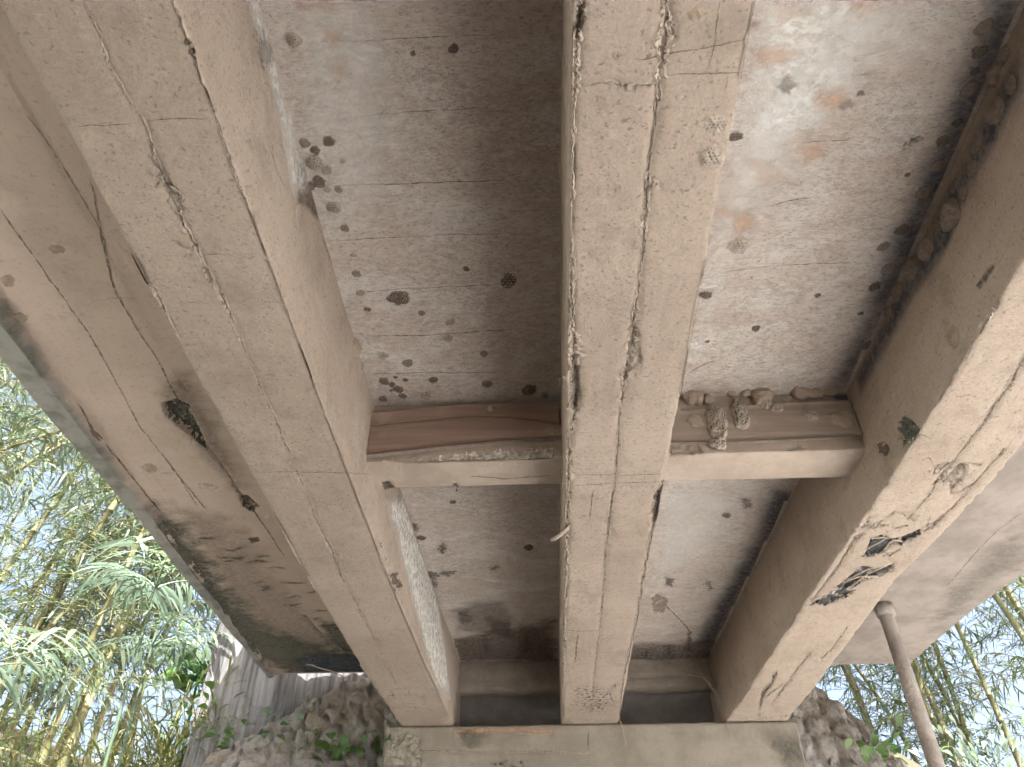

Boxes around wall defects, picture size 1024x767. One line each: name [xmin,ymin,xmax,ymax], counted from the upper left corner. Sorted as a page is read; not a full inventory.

crack [28,117,178,398]
crack [2,211,206,510]
spalling [162,399,212,452]
crack [77,0,397,685]
leakage [158,520,362,673]
spalling [172,0,449,717]
crack [575,0,746,699]
spalling [873,417,927,456]
spalling [809,448,1008,608]
leakage [843,16,1018,385]
crack [852,352,1024,557]